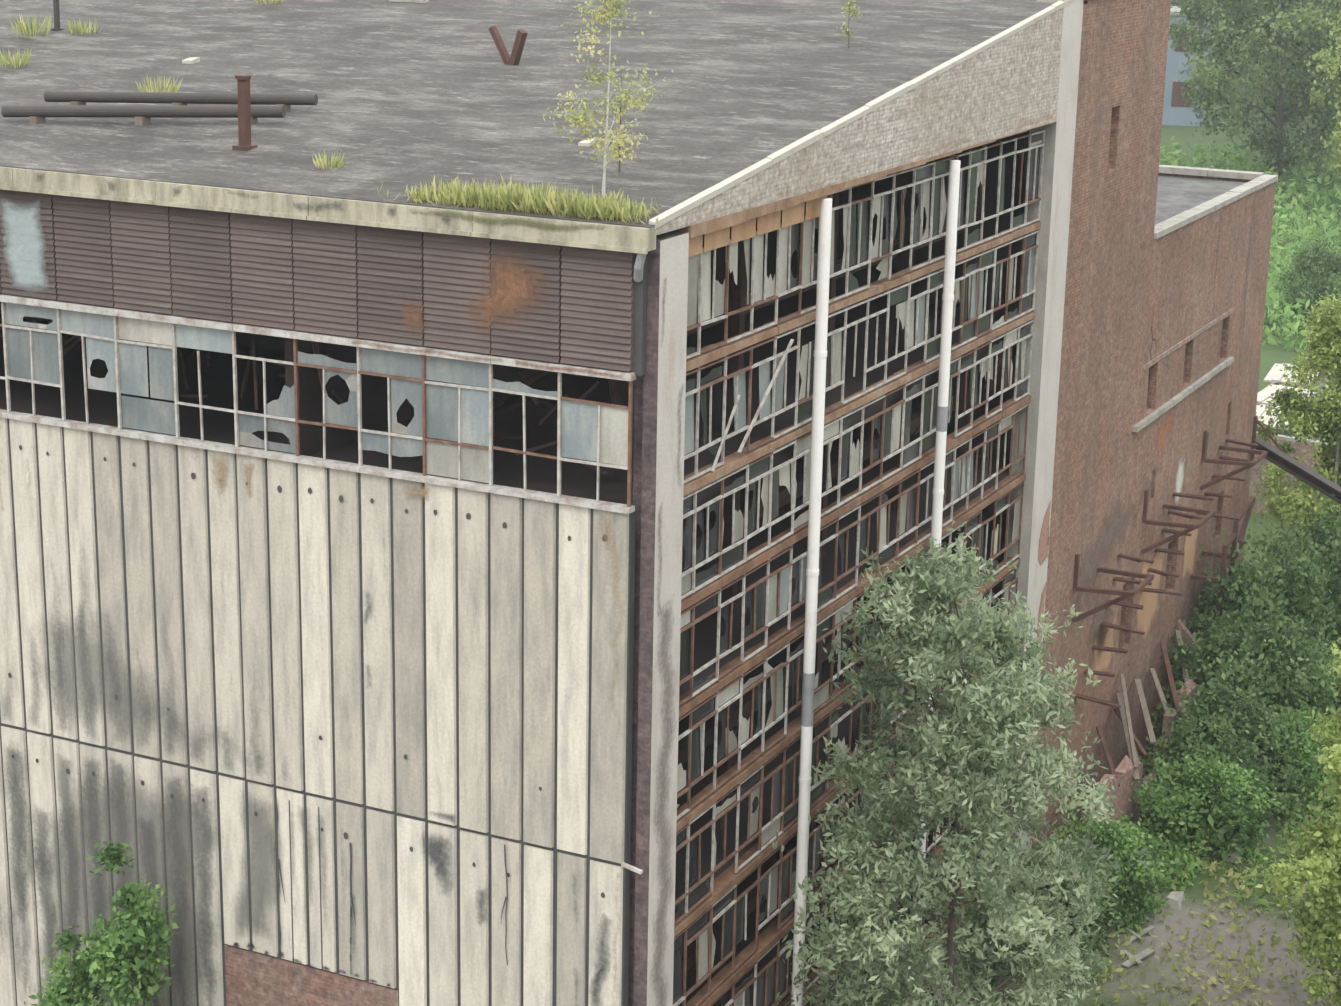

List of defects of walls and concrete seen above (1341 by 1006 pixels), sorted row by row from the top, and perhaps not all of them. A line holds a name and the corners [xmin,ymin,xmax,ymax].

peeling [3,203,45,287]
rust [482,263,536,323]
damp [427,838,447,881]